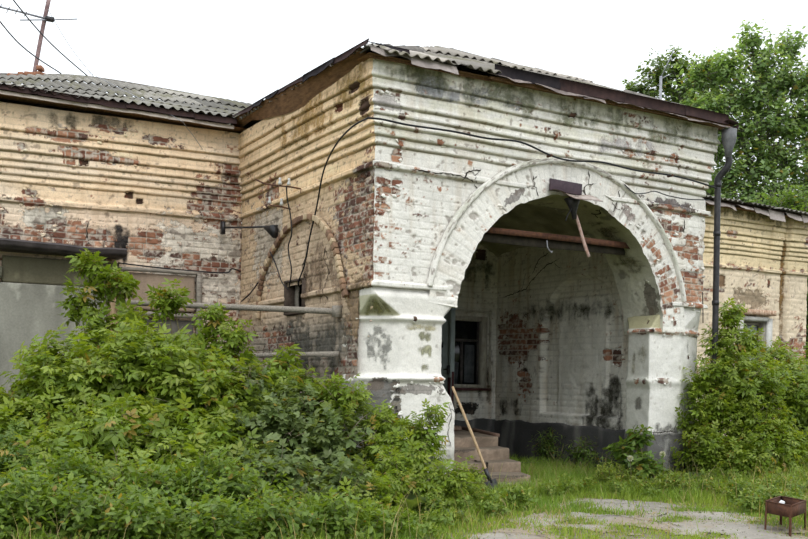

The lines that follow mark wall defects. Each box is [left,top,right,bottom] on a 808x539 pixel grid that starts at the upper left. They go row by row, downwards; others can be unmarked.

damp [416,68,533,118]
flaking render [17,124,184,169]
crack [412,169,481,188]
flaking render [0,187,117,247]
peeling [126,163,288,314]
flaking render [333,138,406,346]
flaking render [621,194,806,338]
mould [366,327,392,369]
flaking render [497,309,550,402]
damp [582,377,622,430]